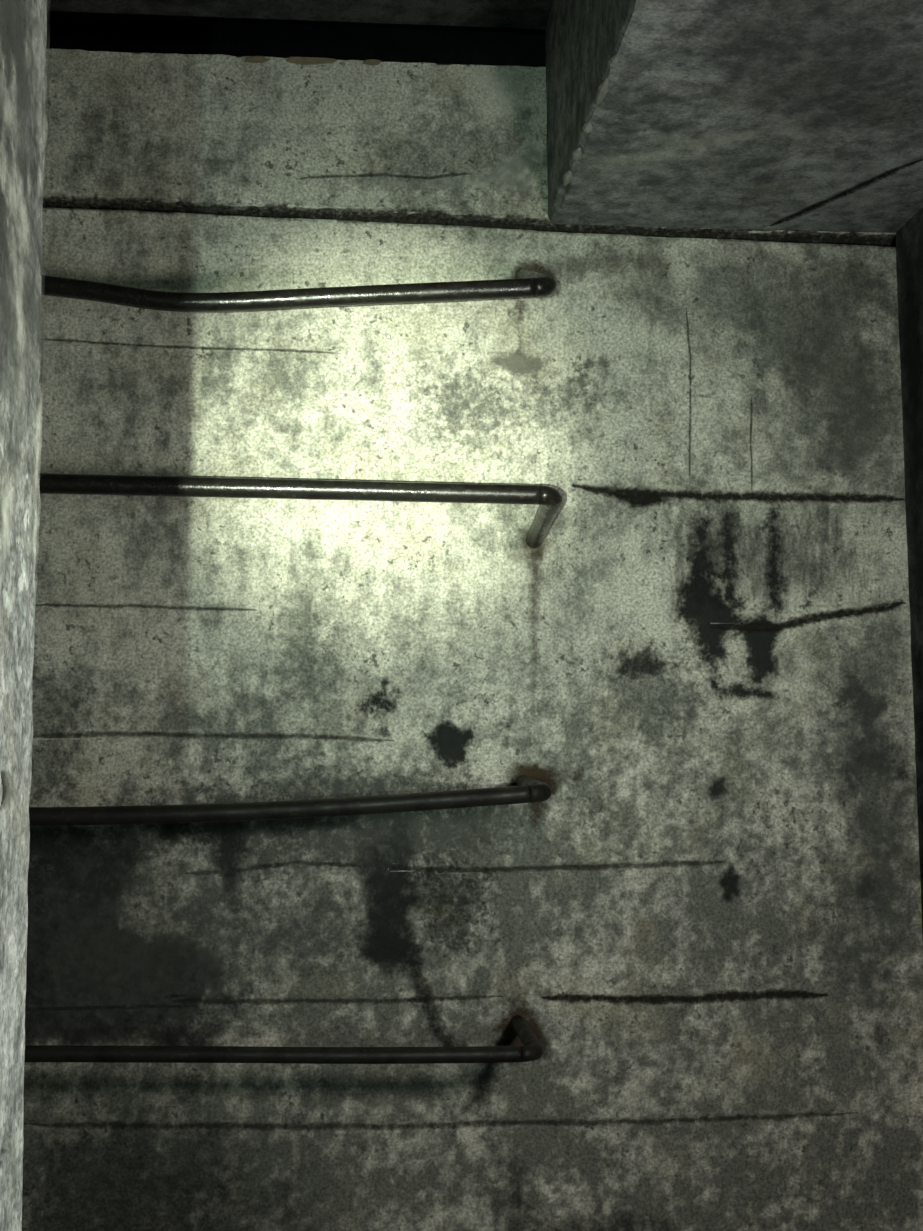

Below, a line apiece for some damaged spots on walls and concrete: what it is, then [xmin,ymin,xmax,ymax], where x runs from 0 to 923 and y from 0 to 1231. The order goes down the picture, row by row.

crack [572,313,904,506]
leakage [677,510,785,699]
crack [710,602,906,632]
crack [33,732,394,741]
leakage [182,722,480,805]
leakage [361,680,400,736]
leakage [46,805,514,1047]
crack [542,990,828,1004]